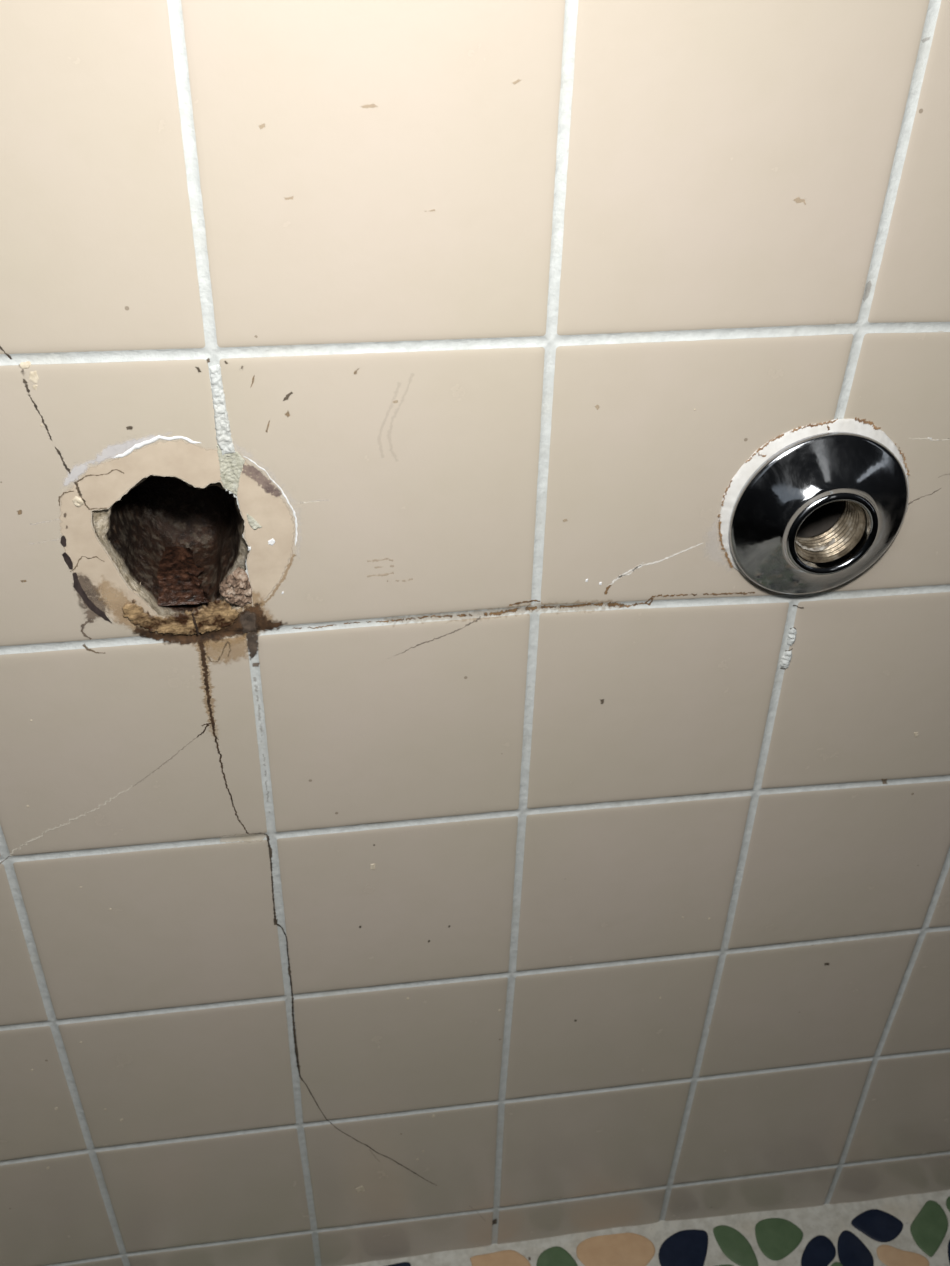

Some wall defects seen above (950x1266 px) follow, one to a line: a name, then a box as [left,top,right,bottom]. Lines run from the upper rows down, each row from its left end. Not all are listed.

crack [0,346,86,502]
corrosion [745,419,838,463]
spalling [60,496,112,653]
crack [292,543,755,652]
corrosion [718,480,733,568]
crack [0,785,132,864]
crack [192,613,437,1186]